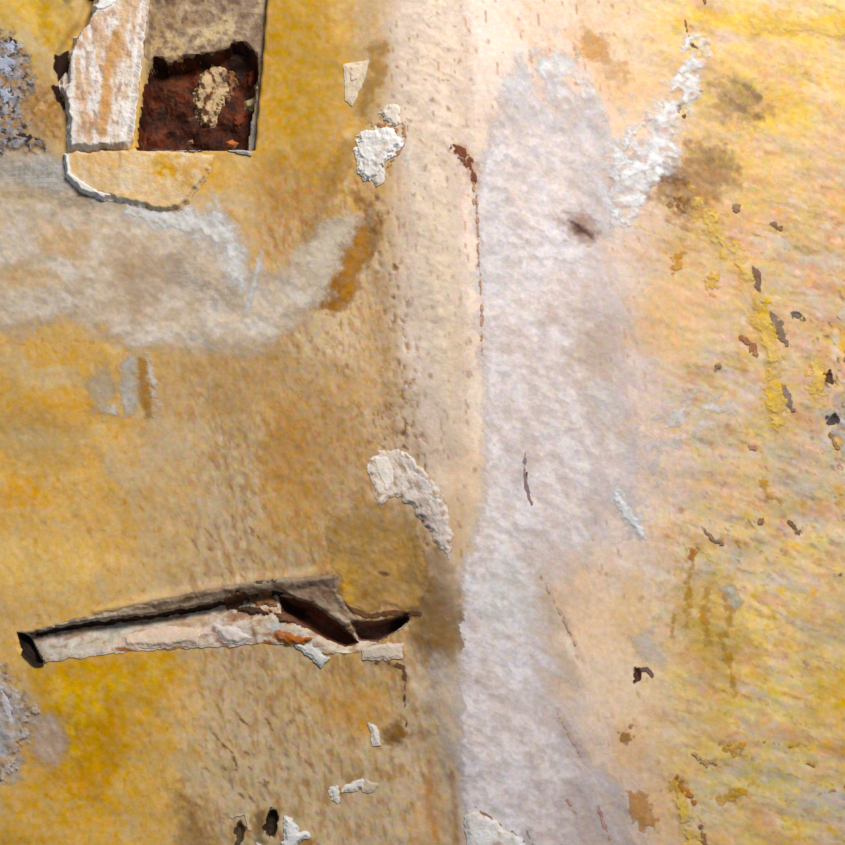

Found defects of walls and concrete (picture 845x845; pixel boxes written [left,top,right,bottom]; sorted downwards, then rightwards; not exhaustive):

flaking render [0,29,46,157]
flaking render [51,0,267,211]
flaking render [353,103,410,186]
leakage [0,152,358,353]
leakage [413,34,711,845]
flaking render [17,449,454,668]
leakage [685,564,743,687]
hole [230,807,312,845]
peeling [464,809,526,845]